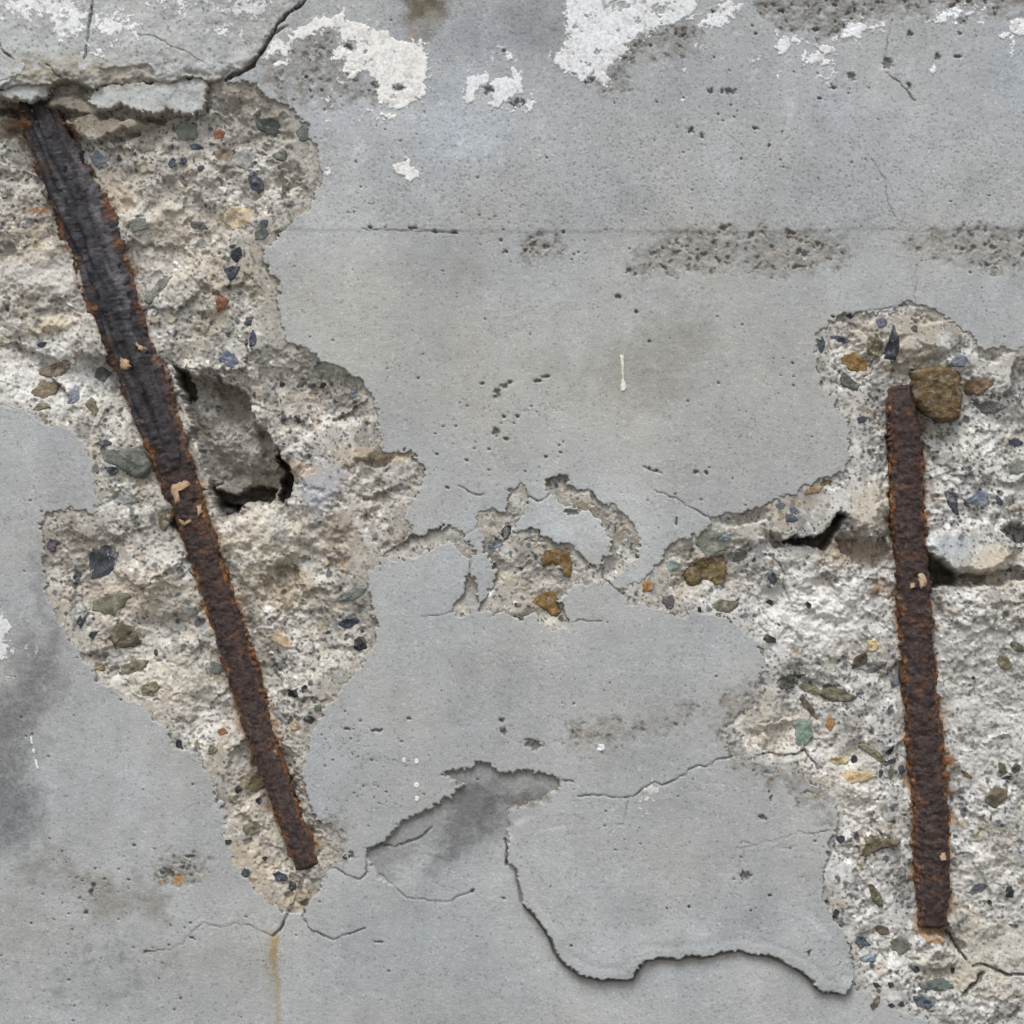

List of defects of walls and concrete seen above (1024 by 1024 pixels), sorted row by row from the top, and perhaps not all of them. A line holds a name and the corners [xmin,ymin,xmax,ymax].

crack [224,7,299,82]
peeling [548,0,888,93]
peeling [904,0,1024,34]
spalling [0,0,646,913]
spalling [618,301,1024,1024]
crack [330,833,426,879]
crack [277,880,362,939]
rust [915,896,952,944]